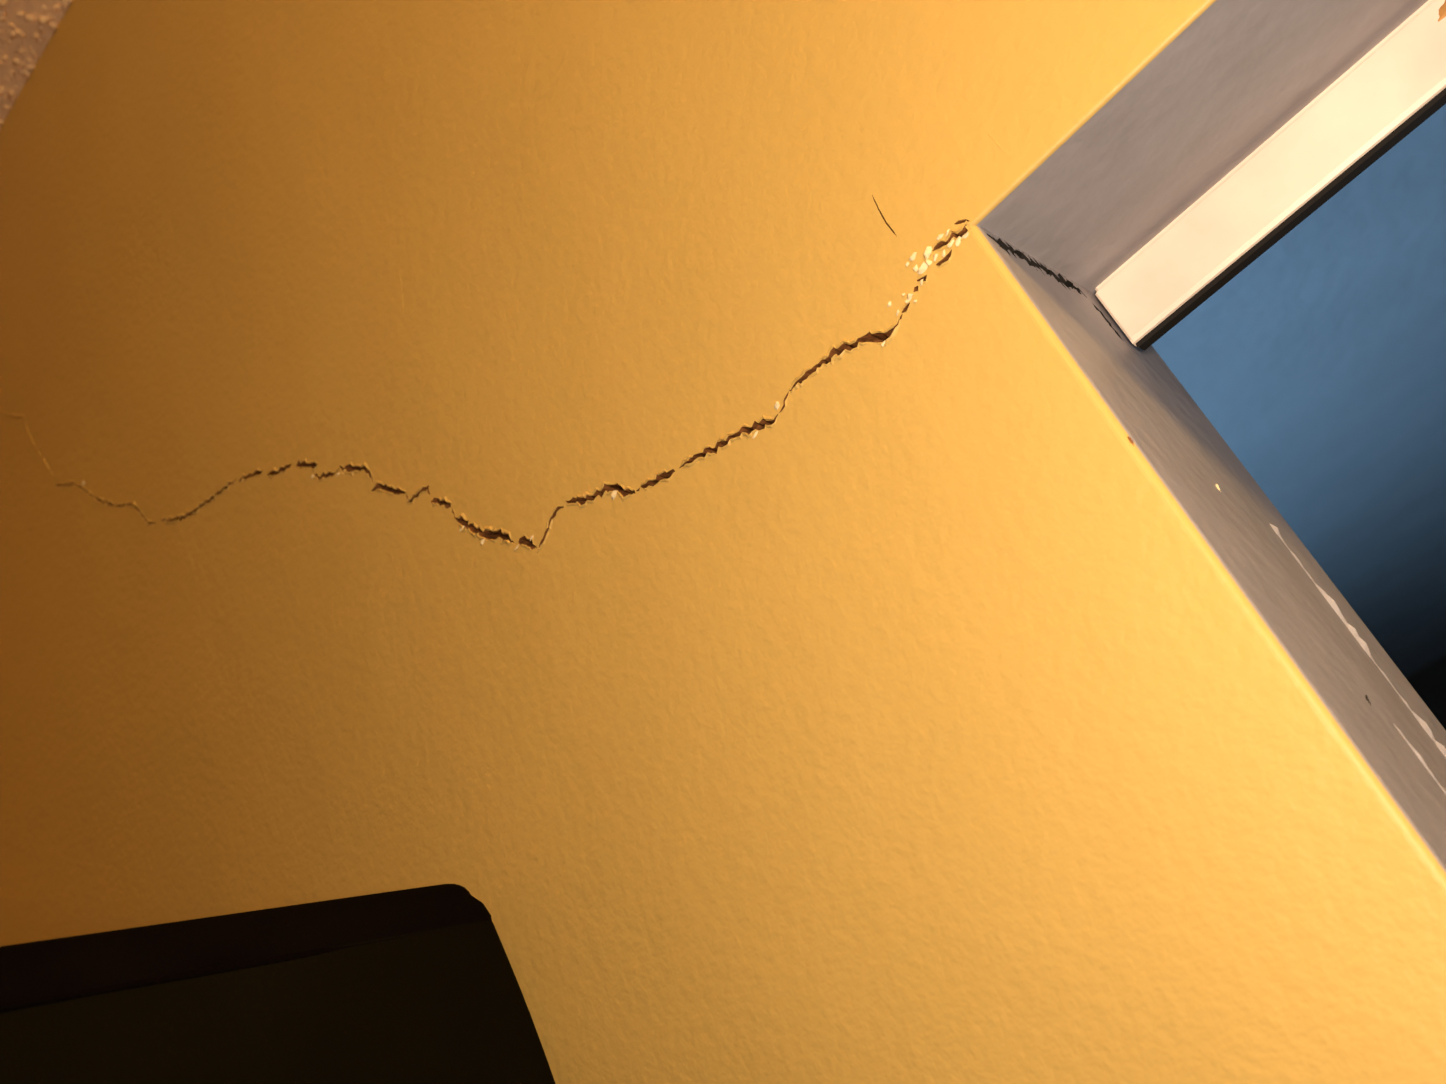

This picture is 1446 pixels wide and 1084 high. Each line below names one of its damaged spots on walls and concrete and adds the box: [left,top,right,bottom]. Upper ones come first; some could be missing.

crack [0,197,1122,553]